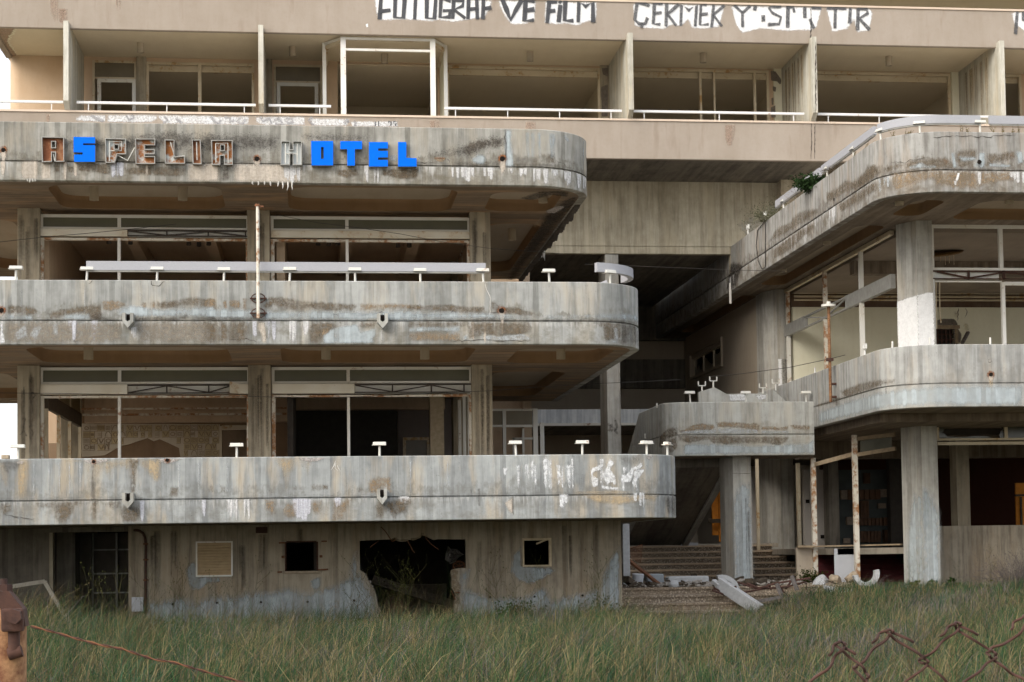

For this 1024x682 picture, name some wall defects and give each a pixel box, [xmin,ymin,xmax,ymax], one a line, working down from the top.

water stain [22,161,301,182]
water stain [338,166,418,182]
water stain [827,150,1024,222]
water stain [773,210,816,257]
water stain [0,293,529,343]
water stain [659,422,814,454]
water stain [123,460,159,521]
efflorescence [228,499,250,518]
water stain [287,499,318,520]
water stain [370,479,411,515]
water stain [503,459,573,507]
water stain [592,475,644,504]